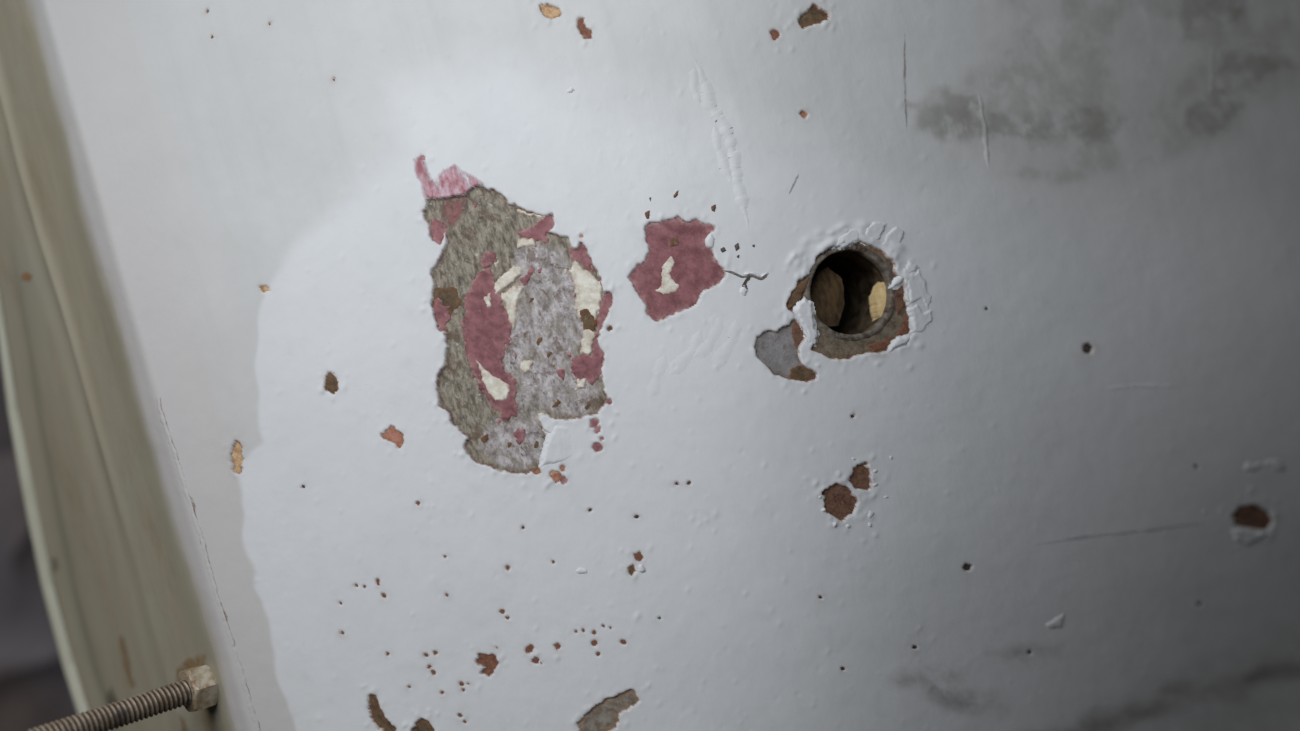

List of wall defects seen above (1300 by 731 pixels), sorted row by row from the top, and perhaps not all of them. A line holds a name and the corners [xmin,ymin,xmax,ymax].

peeling [799,5,828,28]
peeling [831,222,904,250]
peeling [629,197,725,321]
peeling [415,155,613,484]
peeling [755,276,820,381]
peeling [887,260,933,353]
peeling [822,463,870,521]
peeling [1232,505,1271,530]
peeling [369,695,396,731]
peeling [413,719,434,731]
peeling [578,690,639,731]